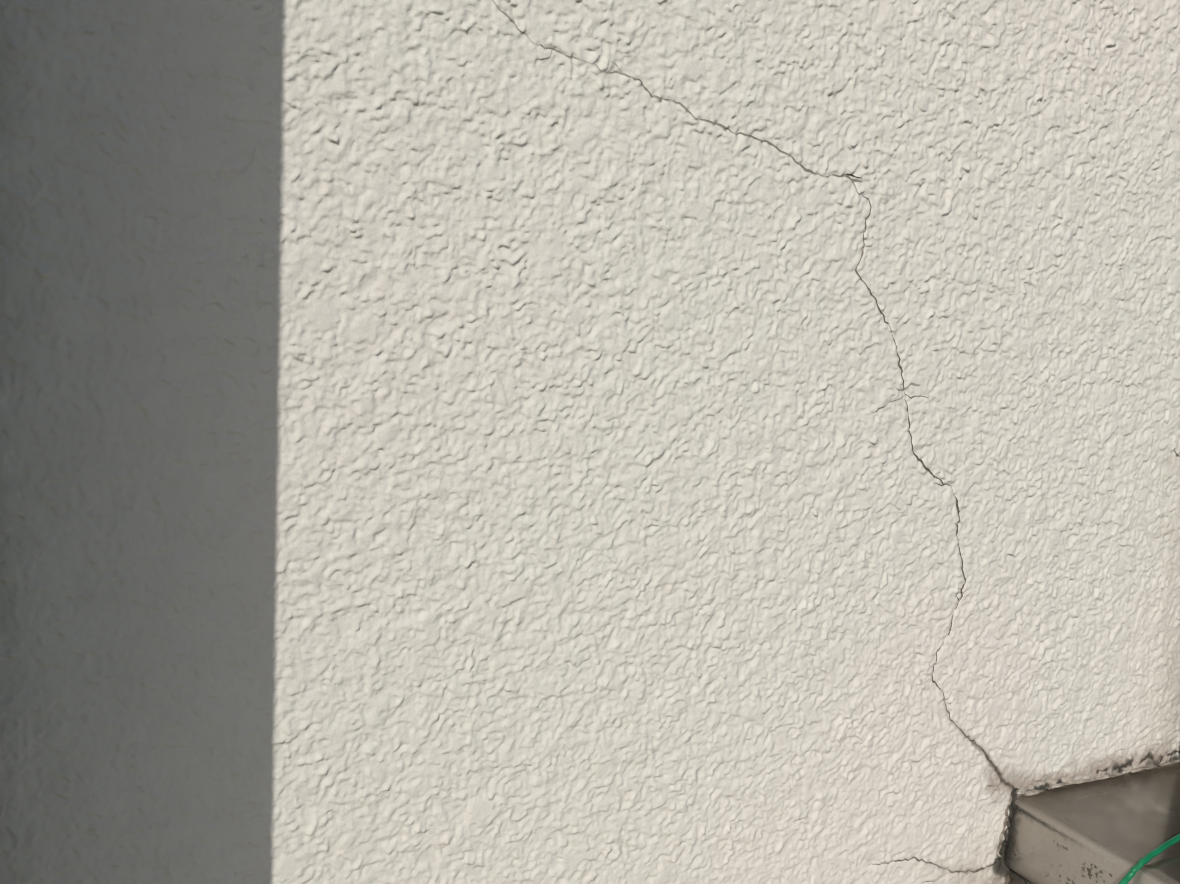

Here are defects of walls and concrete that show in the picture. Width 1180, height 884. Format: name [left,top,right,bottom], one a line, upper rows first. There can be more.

crack [493,1,1014,791]
crack [873,857,999,883]